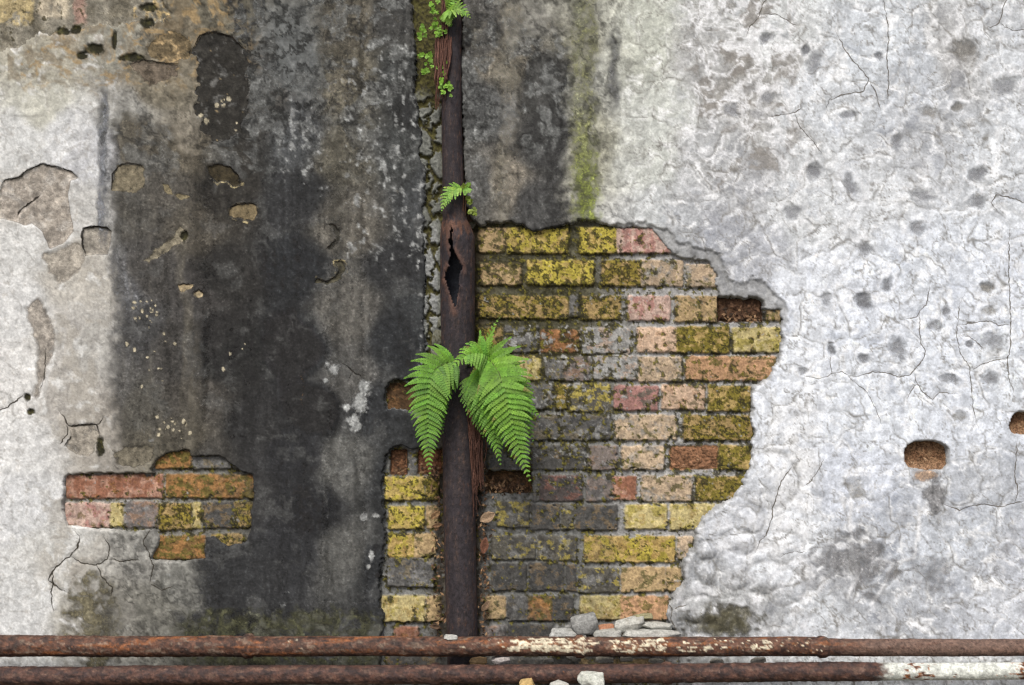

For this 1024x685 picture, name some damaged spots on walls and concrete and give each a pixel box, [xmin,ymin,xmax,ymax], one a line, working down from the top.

flaking render [0,0,251,142]
crack [826,1,889,108]
flaking render [0,163,112,282]
crack [61,415,103,443]
flaking render [64,445,254,561]
damp [97,0,427,635]
flaking render [380,0,447,637]
flaking render [462,131,782,637]
crack [758,461,823,556]
crack [807,230,1014,423]
hole [904,441,946,470]
crack [48,529,170,610]